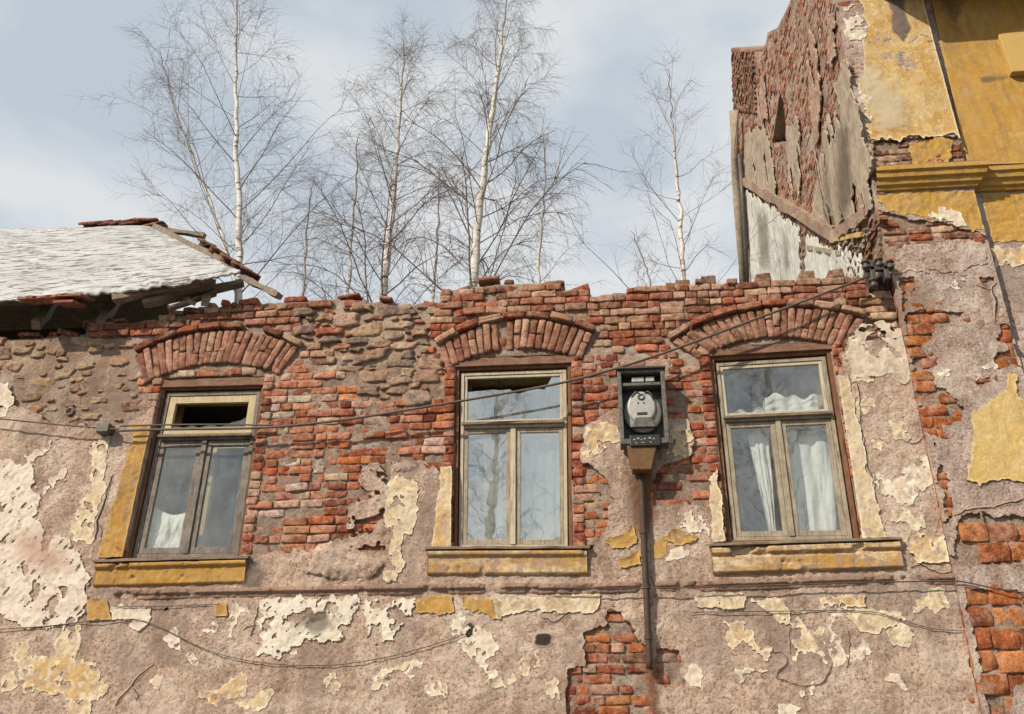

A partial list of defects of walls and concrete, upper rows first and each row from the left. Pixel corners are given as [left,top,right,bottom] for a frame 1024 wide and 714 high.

flaking render [834,0,873,125]
flaking render [873,136,964,168]
flaking render [0,382,15,418]
peeling [581,422,620,457]
peeling [662,425,694,459]
peeling [846,207,1024,565]
flaking render [0,436,152,714]
flaking render [243,516,355,553]
peeling [382,475,419,583]
peeling [606,510,710,568]
flaking render [199,593,703,714]
flaking render [694,584,1024,714]